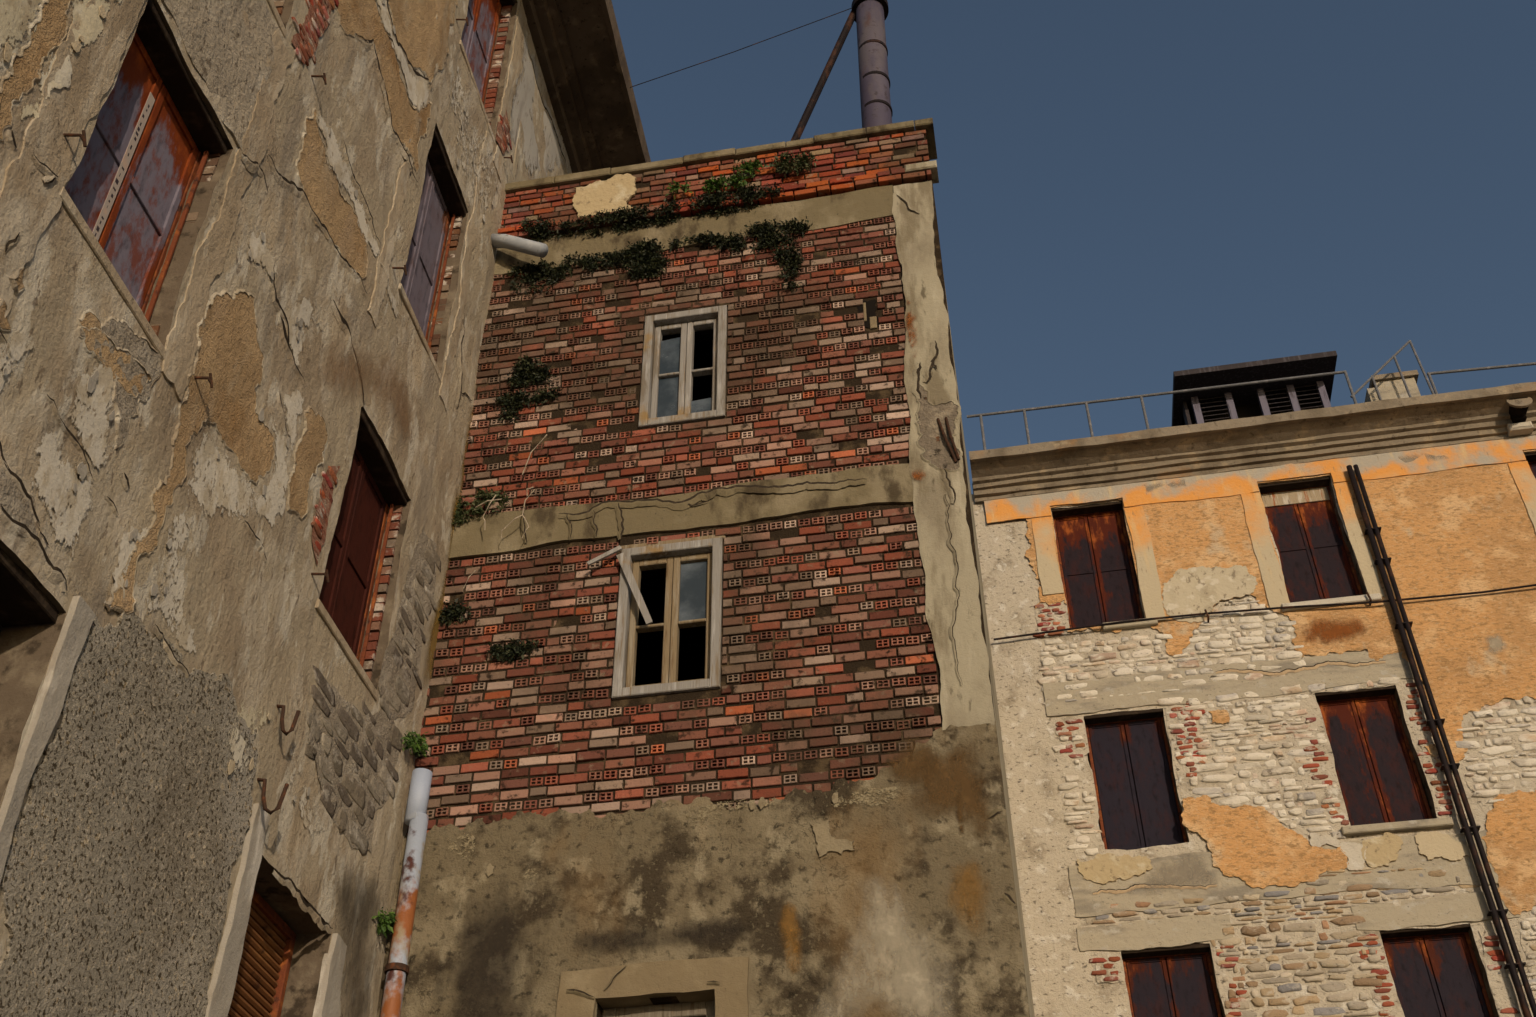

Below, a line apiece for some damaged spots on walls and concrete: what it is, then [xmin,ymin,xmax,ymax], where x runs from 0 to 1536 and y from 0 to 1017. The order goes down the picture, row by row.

flaking render [0,0,122,143]
flaking render [291,0,572,223]
flaking render [295,108,405,319]
crack [897,194,919,213]
crack [912,341,939,399]
flaking render [104,289,340,653]
crack [941,469,963,686]
leakage [893,744,987,832]
flaking render [1033,595,1536,860]
leakage [459,908,517,1017]
leakage [826,884,943,1017]
flaking render [1479,906,1536,1017]